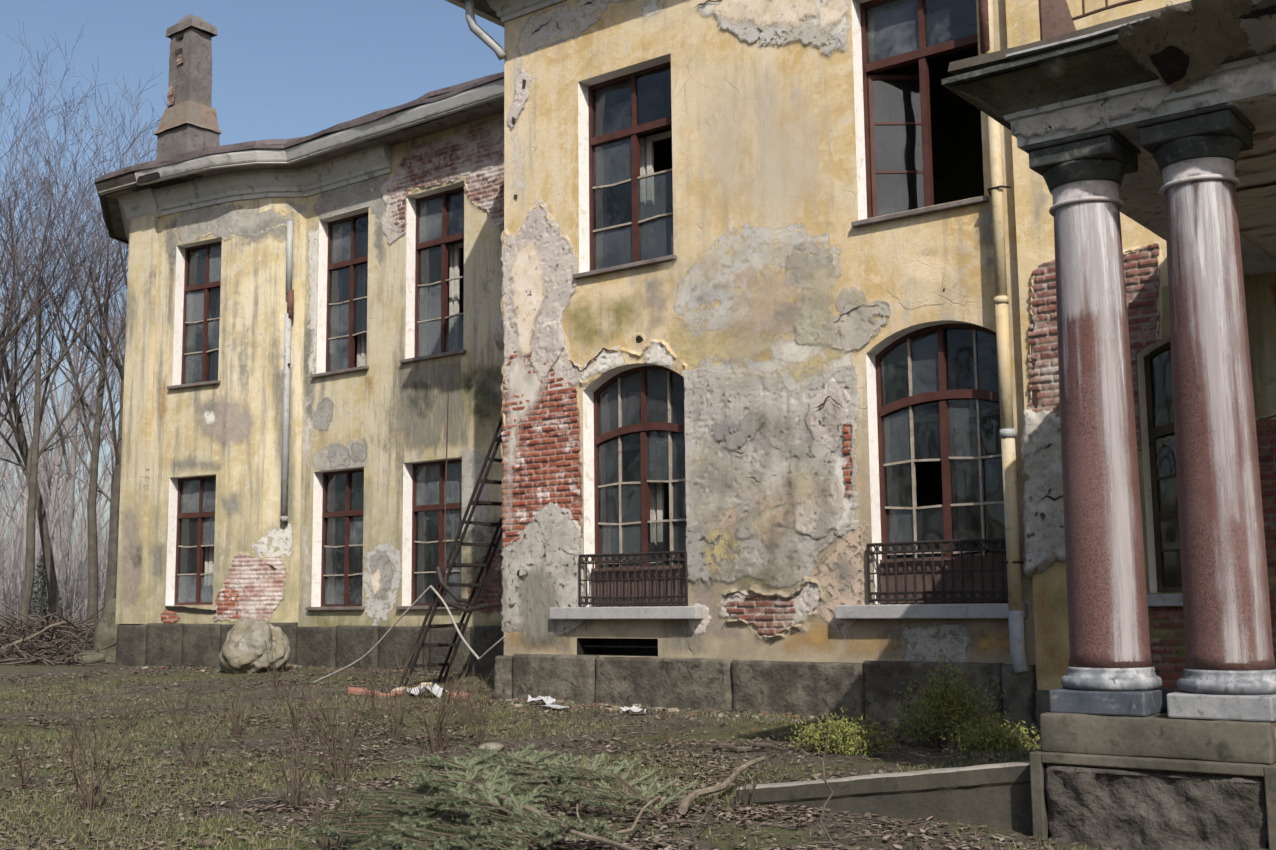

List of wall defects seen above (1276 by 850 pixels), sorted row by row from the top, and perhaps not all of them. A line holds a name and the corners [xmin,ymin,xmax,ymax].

flaking render [515,0,662,57]
flaking render [697,0,852,55]
damp [399,360,503,450]
flaking render [161,114,891,644]
flaking render [1026,258,1061,449]
flaking render [1123,242,1164,454]
flaking render [1255,412,1276,664]